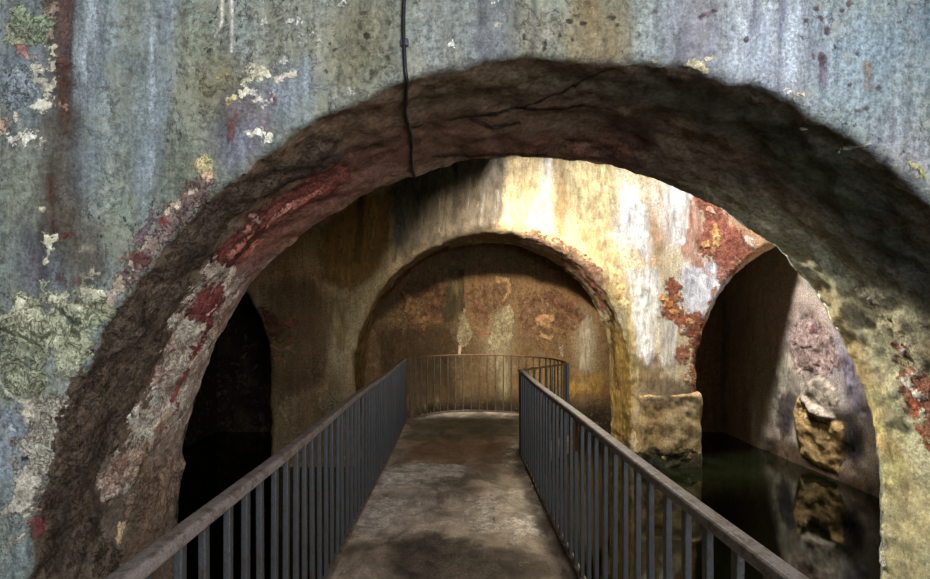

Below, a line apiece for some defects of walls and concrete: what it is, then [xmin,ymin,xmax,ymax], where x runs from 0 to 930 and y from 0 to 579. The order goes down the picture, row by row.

peeling [286,16,321,44]
peeling [0,0,69,150]
peeling [226,55,298,111]
crack [412,69,613,129]
peeling [243,127,273,143]
crack [432,151,547,159]
peeling [0,131,402,579]